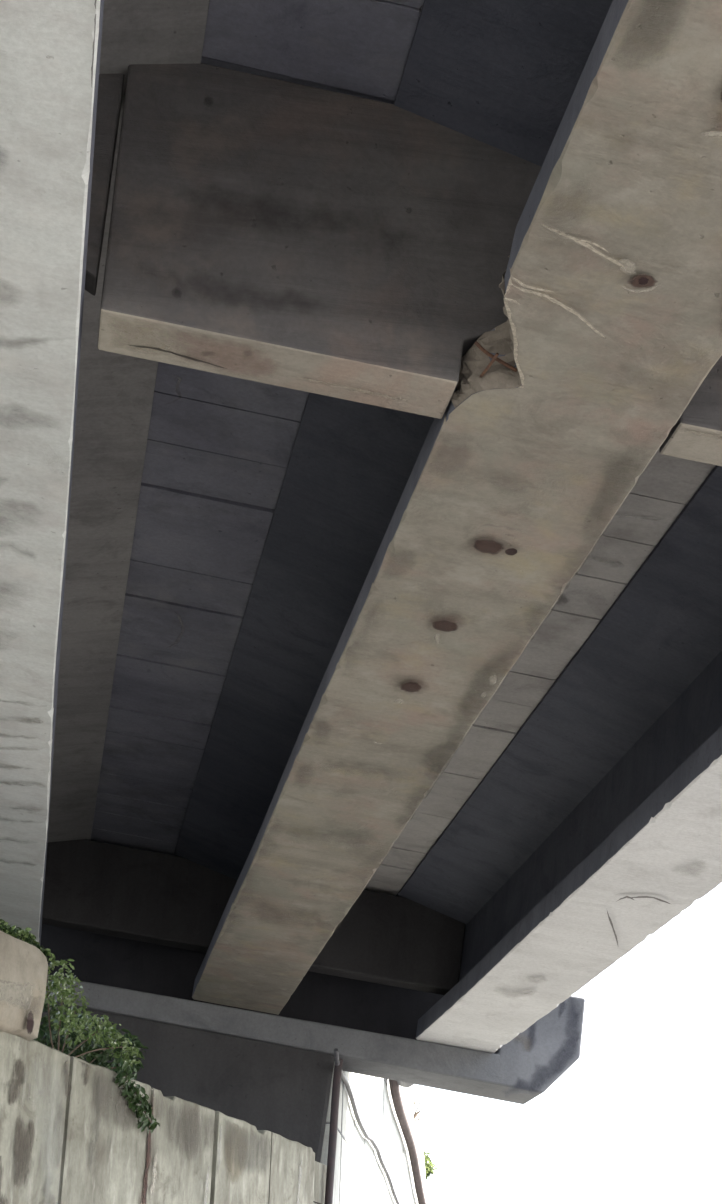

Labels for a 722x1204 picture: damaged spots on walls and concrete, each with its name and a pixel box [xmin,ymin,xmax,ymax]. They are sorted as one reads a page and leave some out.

crack [541,223,626,267]
rust [620,260,657,292]
spalling [450,255,524,408]
crack [503,277,605,338]
rust [474,540,517,555]
rust [433,620,458,642]
rust [394,682,422,703]
crack [607,896,670,945]
damp [512,1002,579,1092]
damp [0,1060,35,1204]